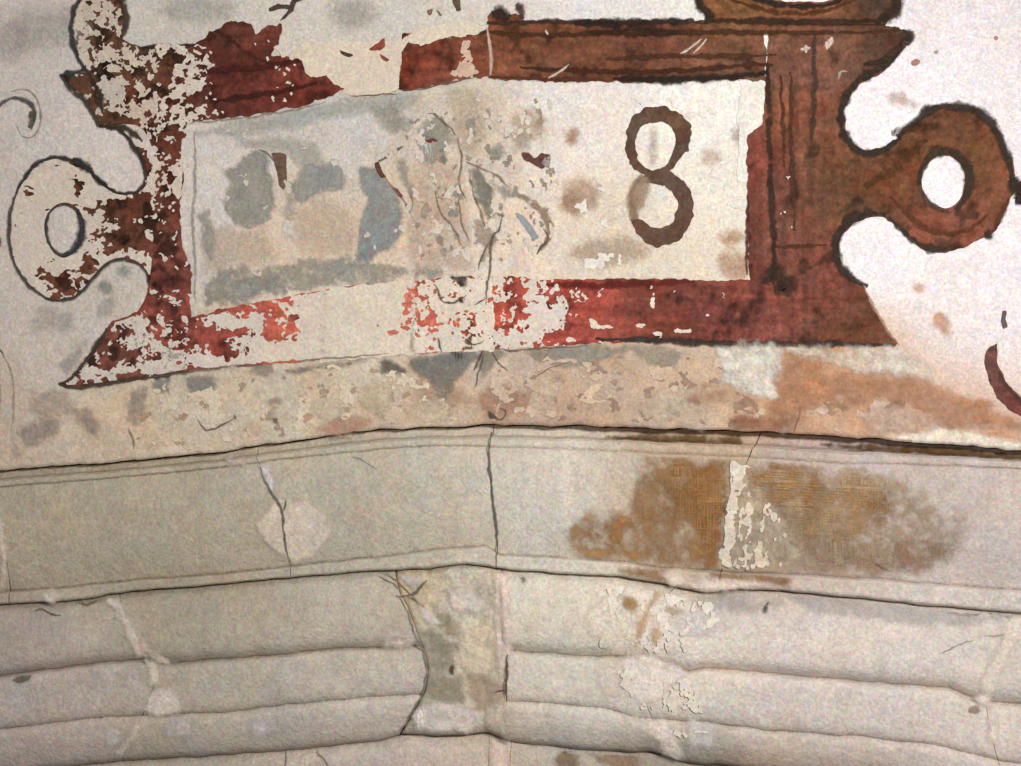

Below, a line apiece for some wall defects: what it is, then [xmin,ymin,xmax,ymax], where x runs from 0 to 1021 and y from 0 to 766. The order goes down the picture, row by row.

peeling [700,83,766,182]
peeling [10,0,705,442]
peeling [709,344,933,427]
crack [260,467,292,563]
crack [488,408,506,566]
peeling [607,460,808,656]
crack [378,572,429,731]